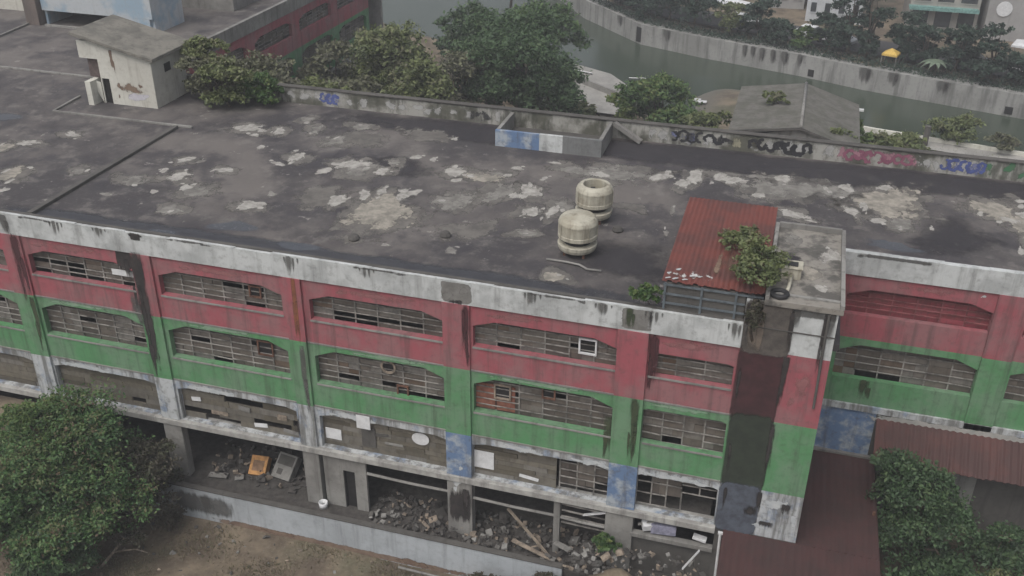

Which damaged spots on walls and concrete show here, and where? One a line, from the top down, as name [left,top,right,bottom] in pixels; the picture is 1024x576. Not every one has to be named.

spalling [117,83,142,98]
peeling [217,115,1024,255]
damp [0,208,665,387]
spalling [441,281,472,304]
damp [627,399,639,457]
damp [715,300,836,534]
damp [176,489,471,575]